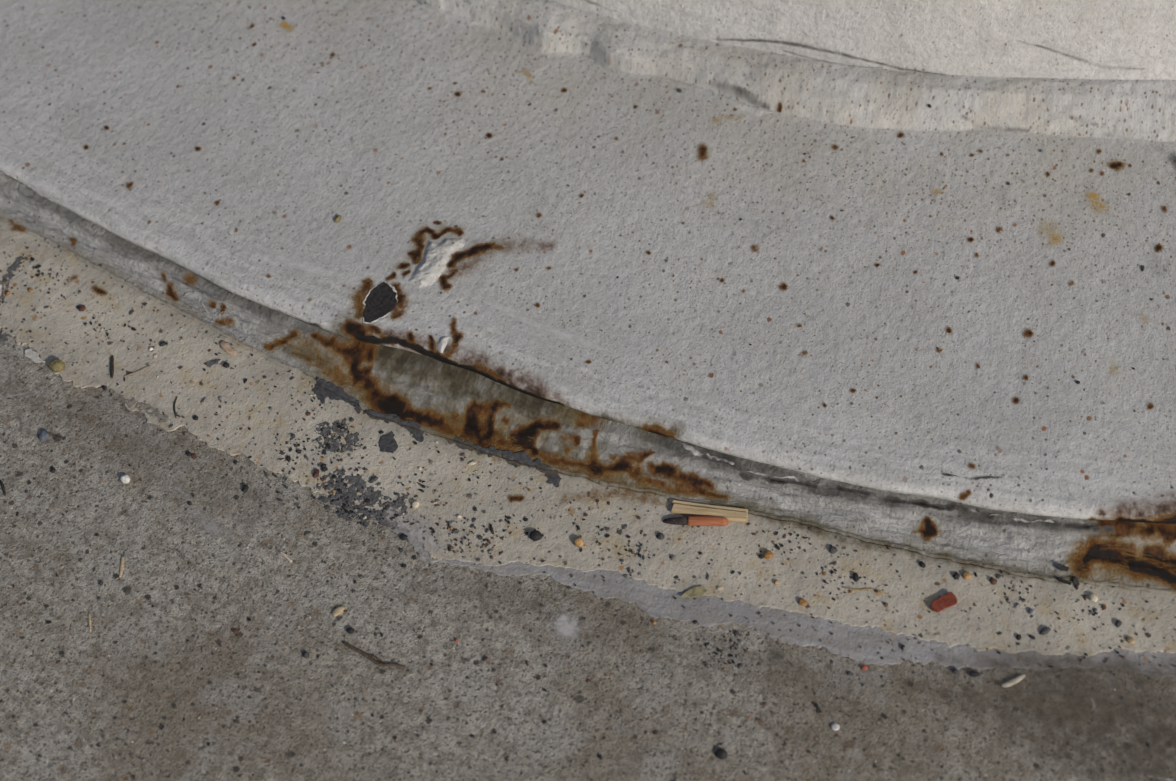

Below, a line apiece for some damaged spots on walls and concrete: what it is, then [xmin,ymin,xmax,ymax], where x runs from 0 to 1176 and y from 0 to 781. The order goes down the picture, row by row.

peeling [0,256,22,302]
peeling [354,280,407,324]
corrosion [386,221,464,281]
corrosion [439,243,503,291]
peeling [313,378,424,454]
corrosion [263,318,728,505]
peeling [314,469,412,530]
corrosion [915,516,938,542]
corrosion [1069,502,1176,593]